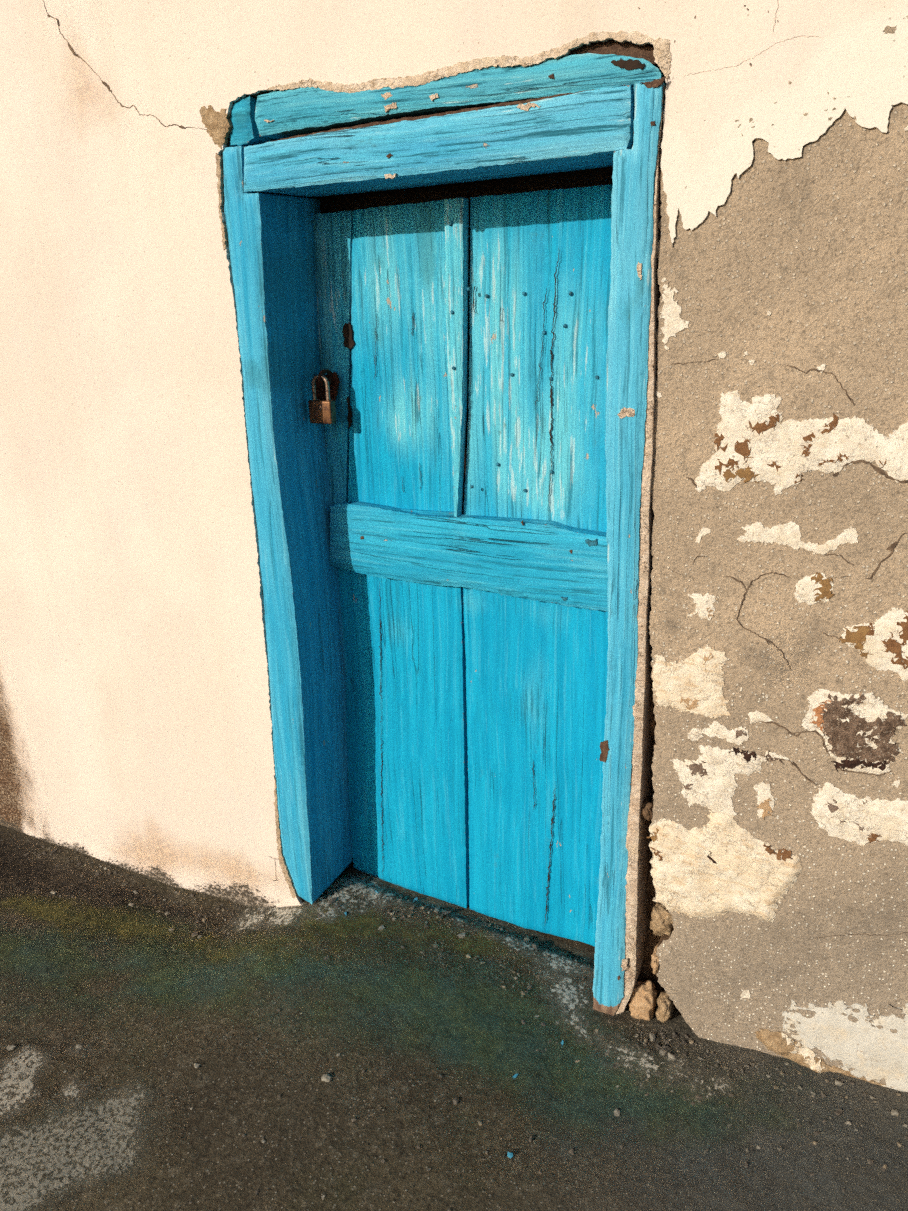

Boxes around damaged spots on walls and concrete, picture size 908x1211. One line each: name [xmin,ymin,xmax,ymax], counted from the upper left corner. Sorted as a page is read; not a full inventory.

crack [43,1,206,130]
crack [671,555,791,670]
flaking render [646,92,908,1092]
water stain [0,683,761,1192]
peeling [492,934,729,1102]